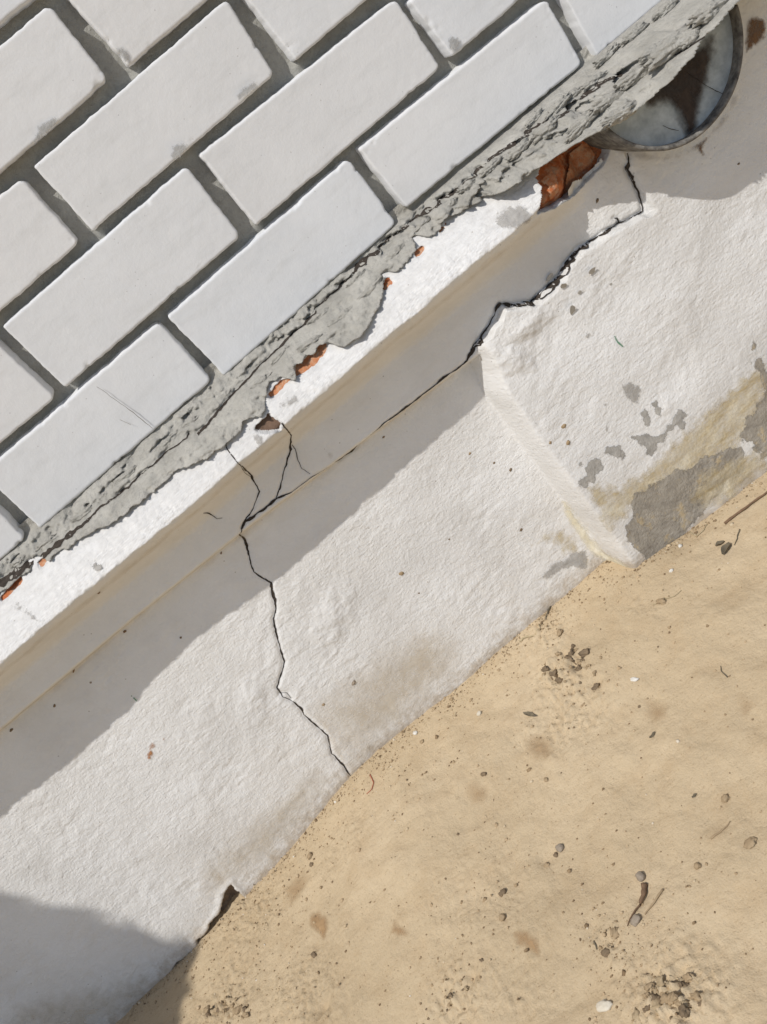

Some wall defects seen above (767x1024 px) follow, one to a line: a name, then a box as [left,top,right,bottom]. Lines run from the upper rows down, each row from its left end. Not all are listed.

crack [674,36,723,94]
spalling [535,141,603,210]
crack [0,73,623,587]
flaking render [268,343,327,397]
spalling [255,414,281,431]
crack [204,153,643,776]
peeling [578,445,625,488]
water stain [594,372,765,518]
peeling [623,343,767,560]
flaking render [1,577,23,601]
peeling [543,552,587,578]